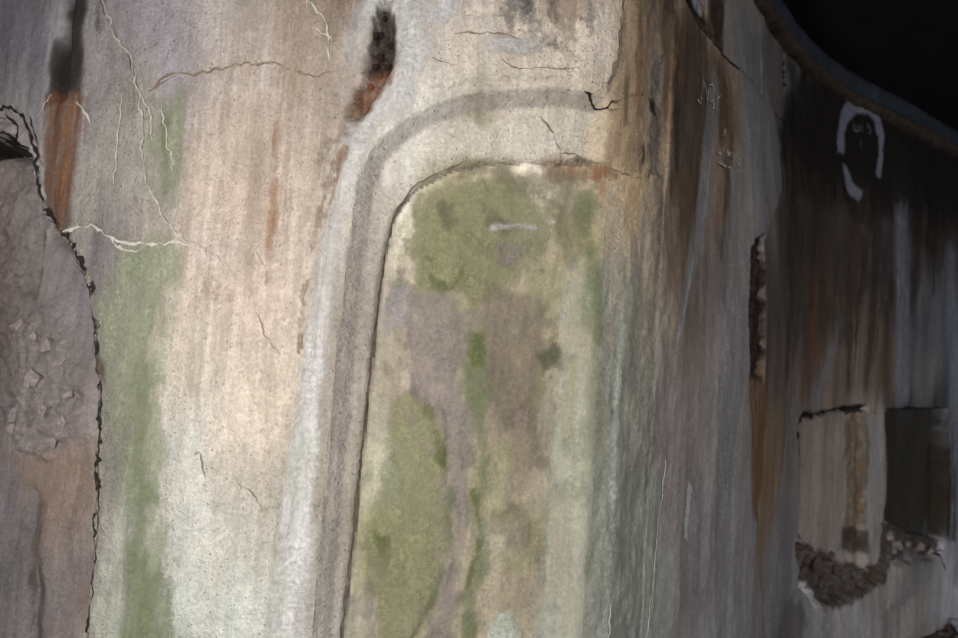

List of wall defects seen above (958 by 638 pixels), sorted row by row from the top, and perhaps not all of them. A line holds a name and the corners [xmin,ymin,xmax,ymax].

corrosion [45,93,81,223]
water stain [50,0,86,101]
crack [584,2,644,111]
spalling [0,147,82,454]
spalling [95,355,105,396]
crack [0,0,348,635]
crack [340,160,467,638]
water stain [592,317,625,532]
corrosion [748,235,766,518]
water stain [671,13,958,536]
corrosion [842,412,870,552]
spalling [795,413,938,610]